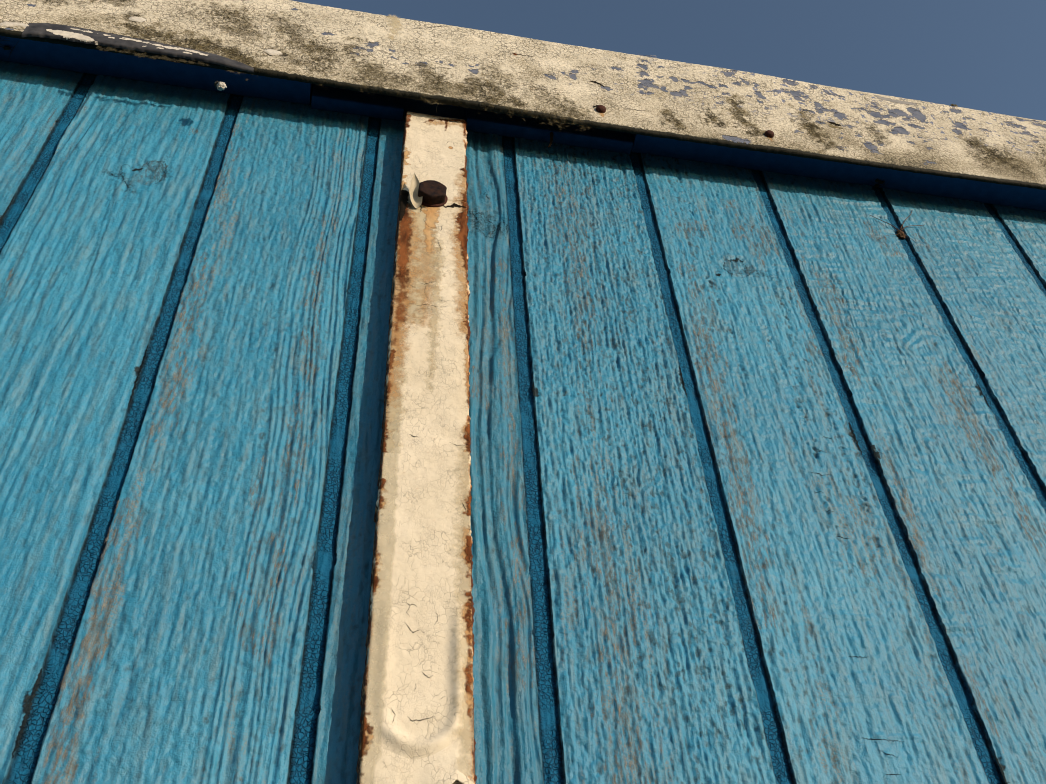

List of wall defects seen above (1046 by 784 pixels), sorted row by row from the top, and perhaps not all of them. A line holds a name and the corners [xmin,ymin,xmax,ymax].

water stain [104,0,406,87]
water stain [417,63,589,122]
water stain [699,95,765,137]
water stain [788,104,844,157]
water stain [967,138,1046,178]
corrosion [382,203,440,452]
corrosion [454,168,470,453]
corrosion [378,478,386,509]
corrosion [372,551,380,593]
corrosion [461,529,472,577]
corrosion [462,590,473,717]
corrosion [361,713,373,760]